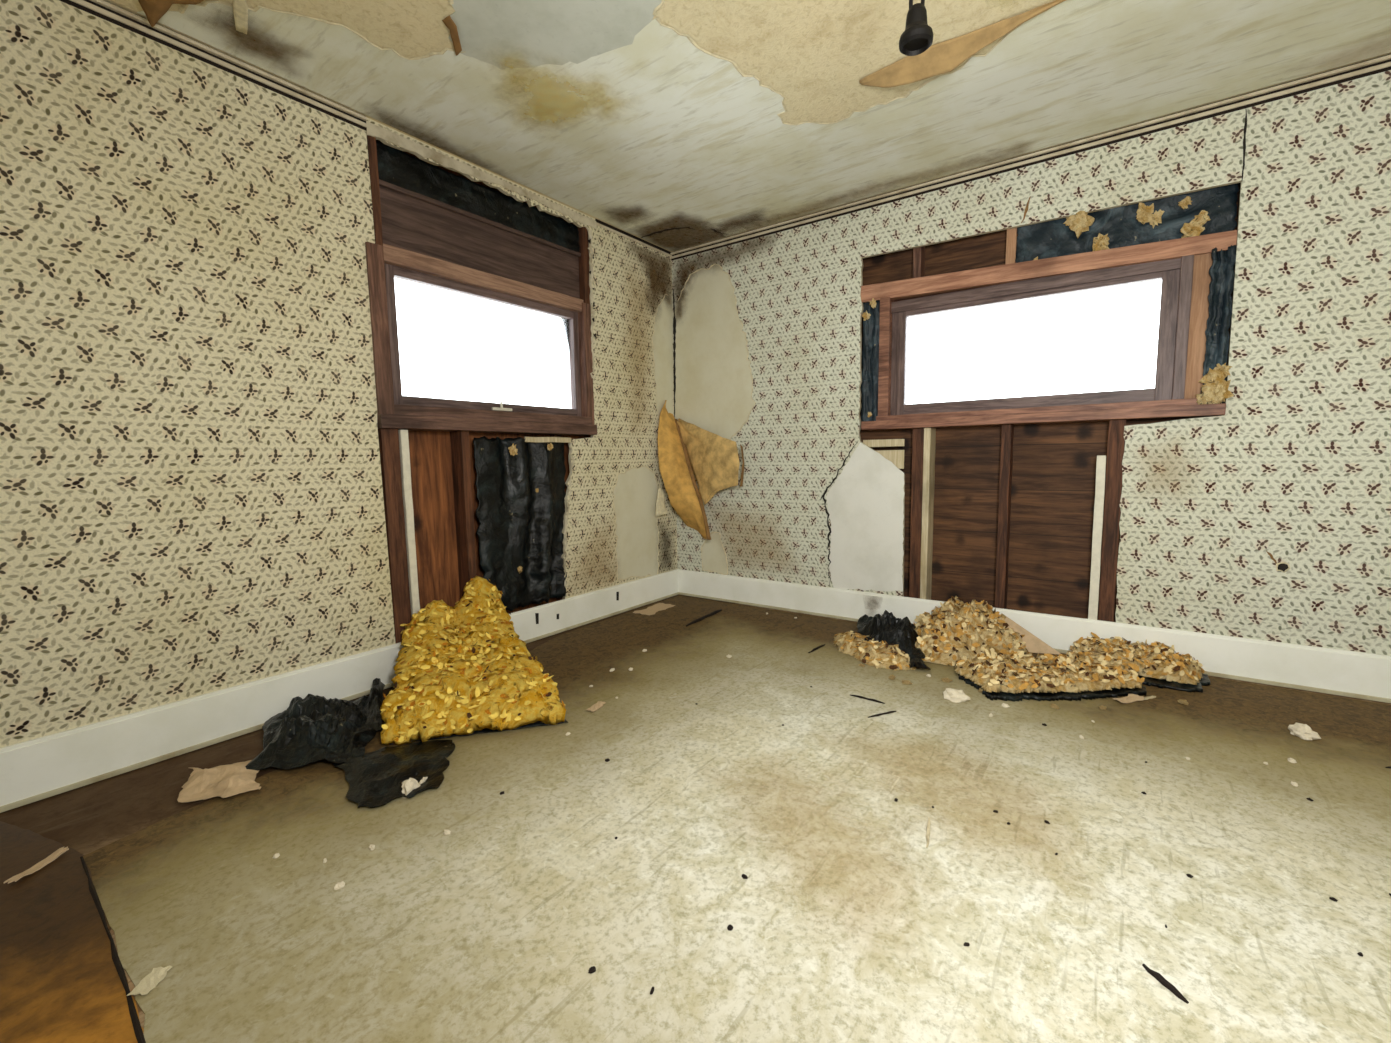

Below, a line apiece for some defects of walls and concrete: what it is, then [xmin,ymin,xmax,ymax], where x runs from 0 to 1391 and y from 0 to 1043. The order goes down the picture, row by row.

peeling [138,0,204,27]
peeling [232,0,248,34]
peeling [442,15,462,56]
peeling [859,0,1066,88]
spalling [366,121,597,378]
damp [609,209,762,315]